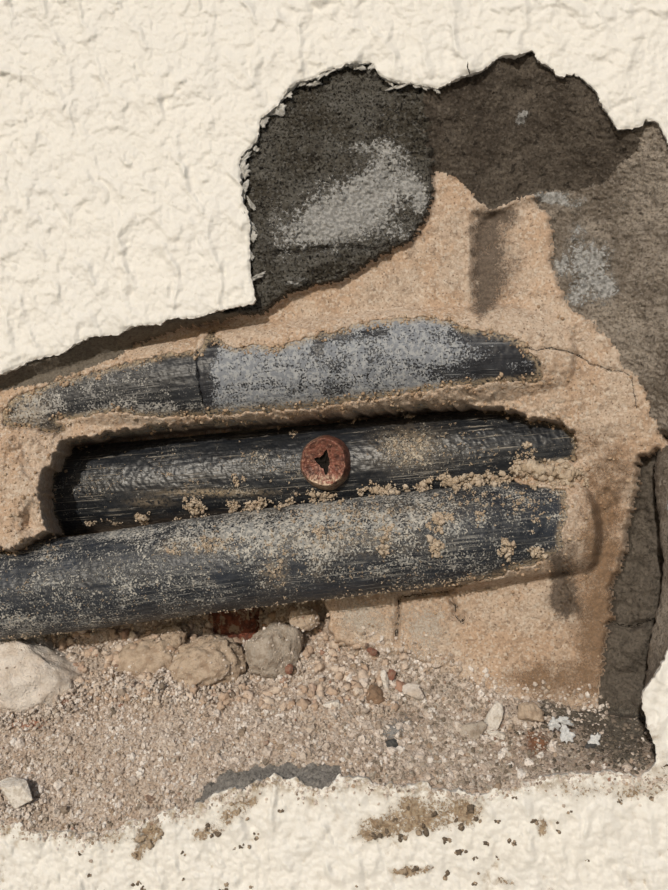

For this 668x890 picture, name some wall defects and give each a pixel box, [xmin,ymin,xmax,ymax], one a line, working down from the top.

spalling [0,52,668,724]
peeling [135,835,154,850]
spalling [0,615,655,835]
peeling [369,811,438,843]